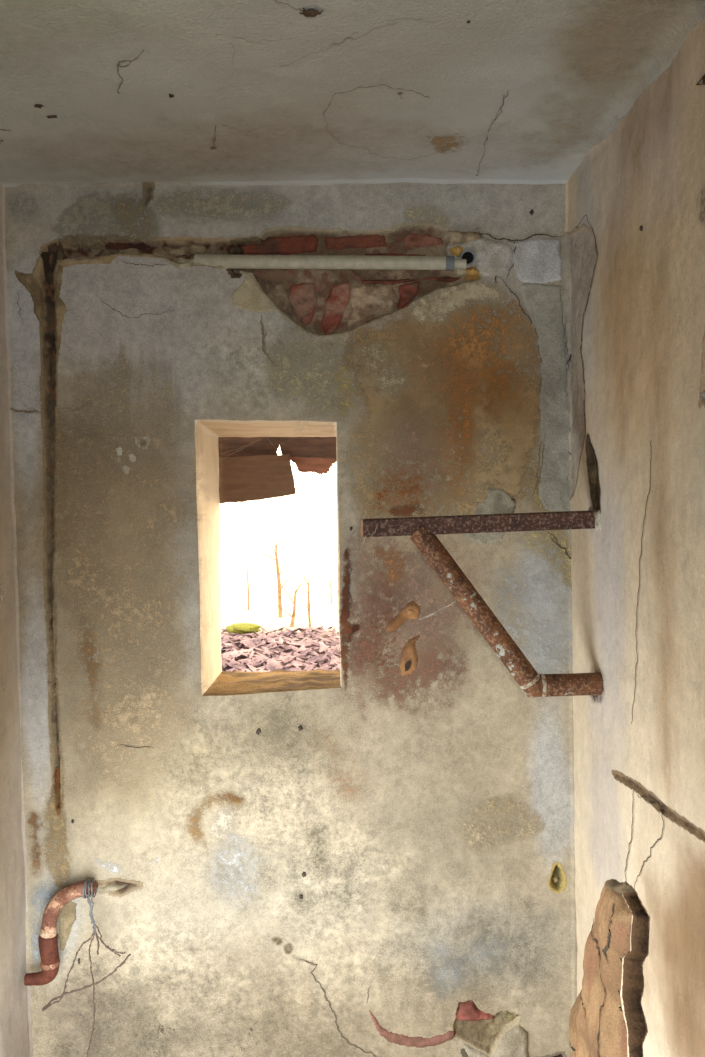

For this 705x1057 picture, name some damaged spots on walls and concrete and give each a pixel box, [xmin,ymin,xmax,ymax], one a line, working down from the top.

flaking render [242,221,483,256]
flaking render [226,268,483,337]
corrosion [344,281,542,519]
corrosion [338,536,475,720]
crack [625,787,664,890]
flaking render [369,999,528,1057]